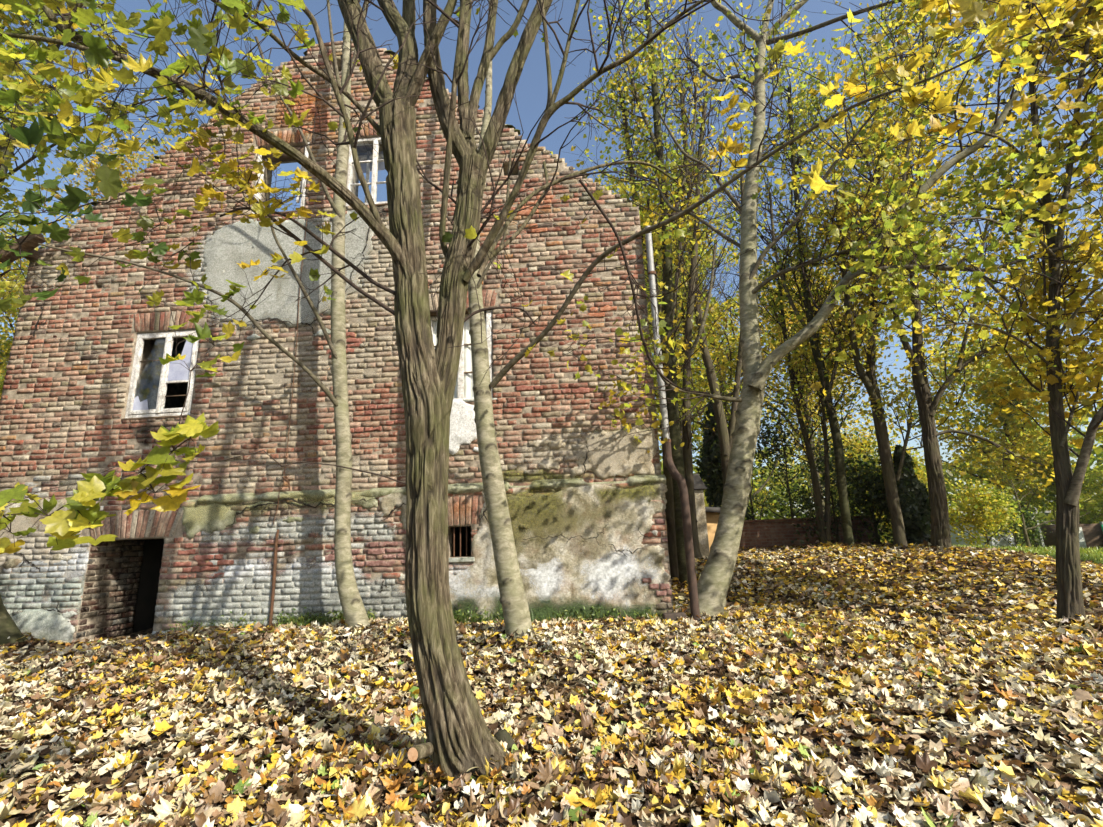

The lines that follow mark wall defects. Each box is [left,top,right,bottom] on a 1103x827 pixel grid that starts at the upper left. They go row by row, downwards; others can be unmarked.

peeling [215,217,332,233]
peeling [345,210,374,300]
peeling [231,302,331,341]
spalling [346,332,362,354]
spalling [351,487,406,581]
peeling [449,491,500,621]
water stain [509,508,600,553]
crack [523,522,655,557]
peeling [516,427,671,613]